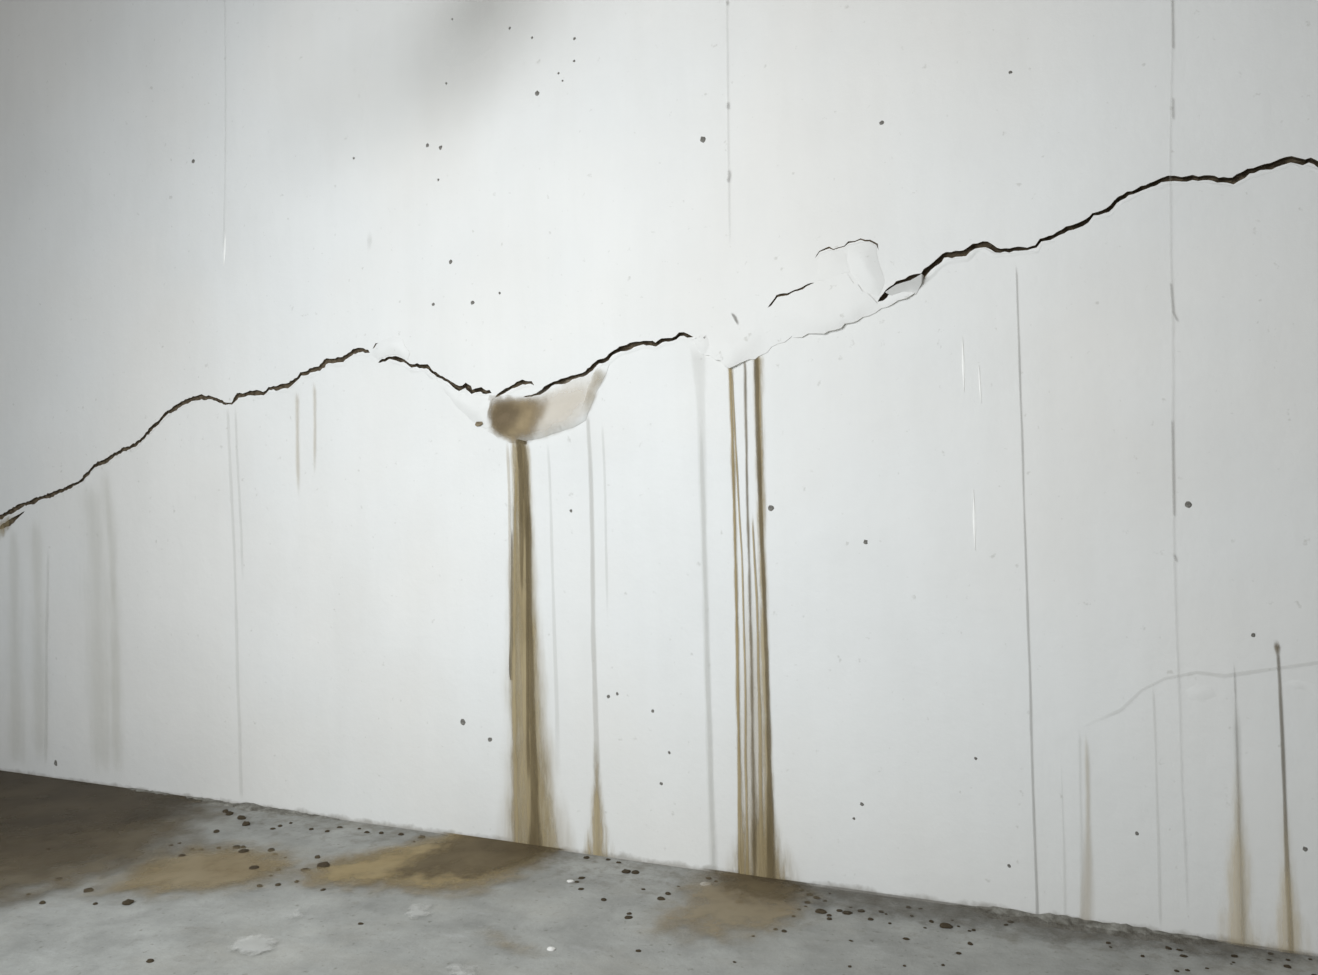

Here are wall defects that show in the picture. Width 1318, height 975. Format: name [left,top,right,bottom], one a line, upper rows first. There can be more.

peeling [693,242,924,369]
crack [816,238,878,260]
crack [878,156,1318,302]
crack [0,332,693,532]